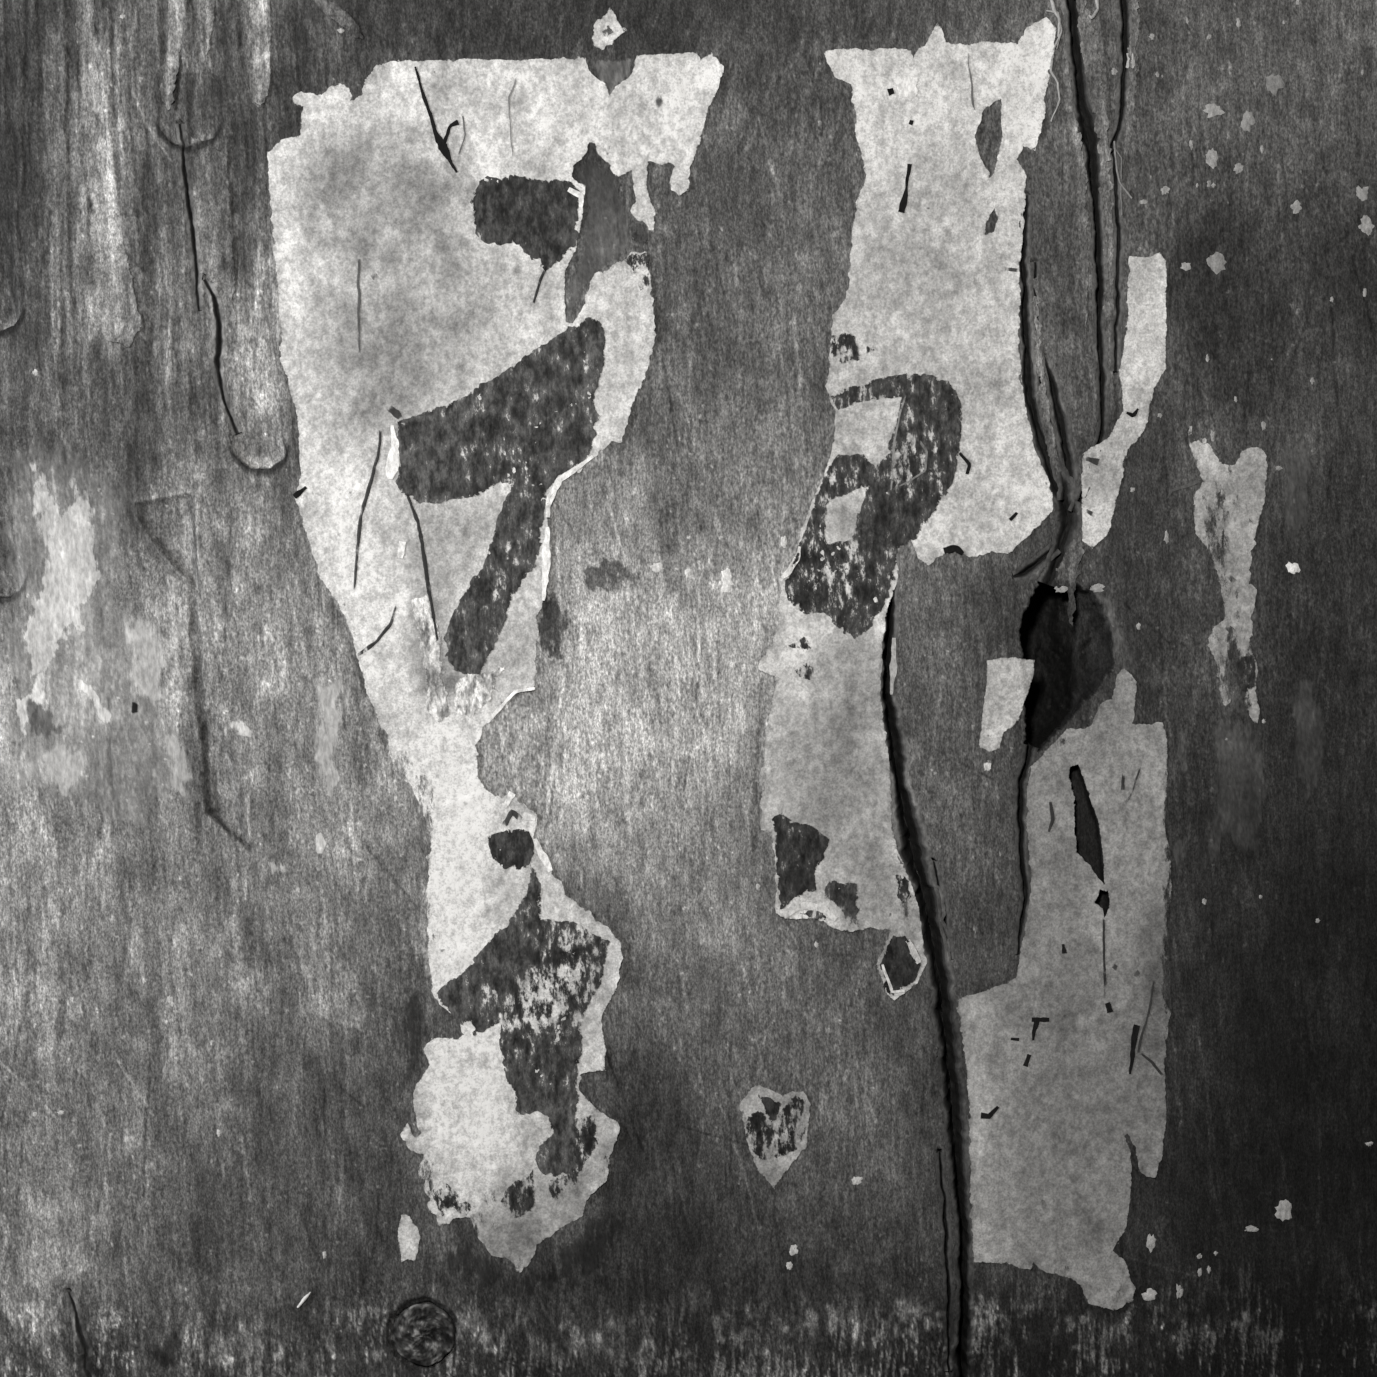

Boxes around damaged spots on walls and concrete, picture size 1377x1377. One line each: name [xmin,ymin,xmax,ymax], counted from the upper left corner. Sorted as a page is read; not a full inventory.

crack [1012,0,1135,589]
crack [880,545,976,1377]